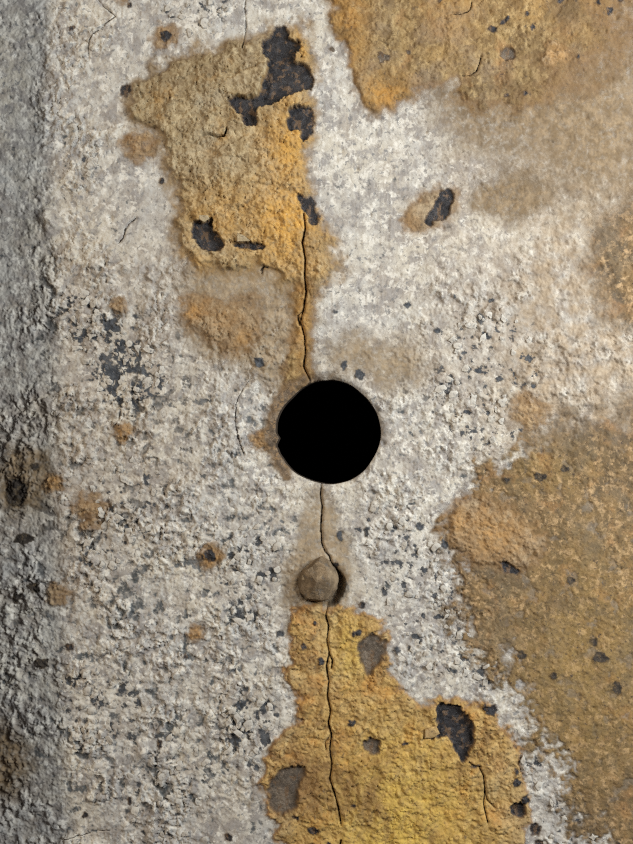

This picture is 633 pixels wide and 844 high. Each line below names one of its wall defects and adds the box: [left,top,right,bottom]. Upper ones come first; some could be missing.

spalling [223,26,314,126]
spalling [286,105,315,141]
corrosion [327,0,633,118]
spalling [191,215,224,252]
corrosion [117,27,339,392]
corrosion [401,189,458,232]
crack [297,228,308,375]
crack [320,487,332,563]
crack [325,607,333,691]
corrosion [257,392,633,844]
crack [328,714,341,822]
spalling [424,702,480,769]